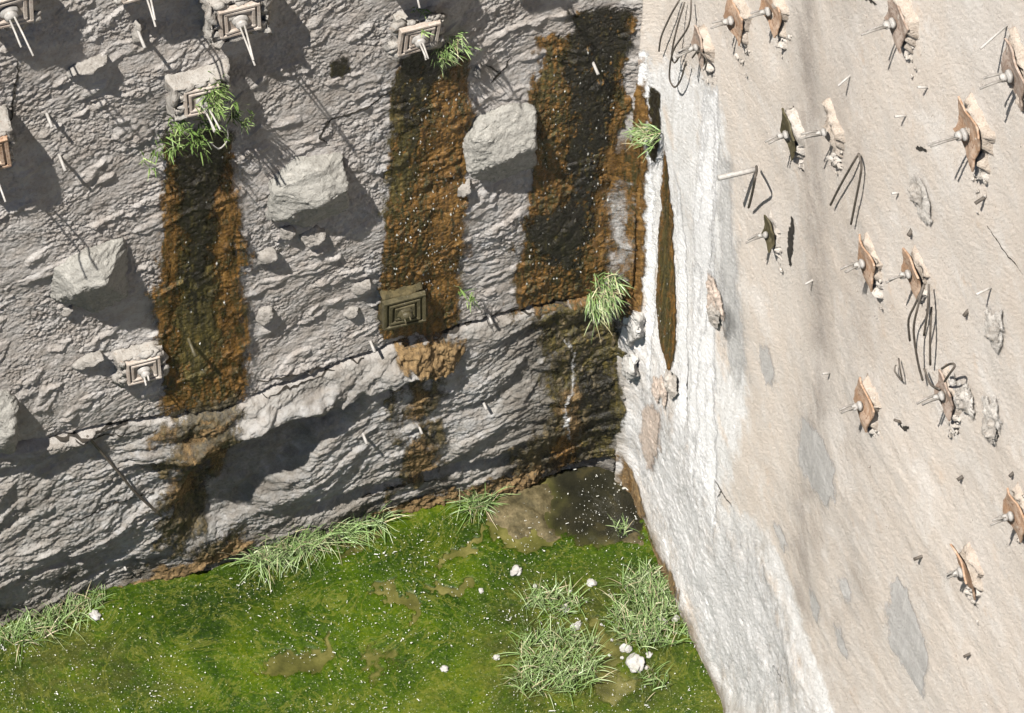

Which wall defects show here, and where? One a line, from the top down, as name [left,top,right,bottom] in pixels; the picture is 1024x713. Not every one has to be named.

damp [376,45,476,342]
spalling [826,153,843,173]
spalling [973,165,989,183]
damp [143,123,255,560]
crack [249,357,364,398]
crack [425,299,568,347]
damp [508,5,791,704]
crack [49,409,172,446]
damp [383,376,459,503]